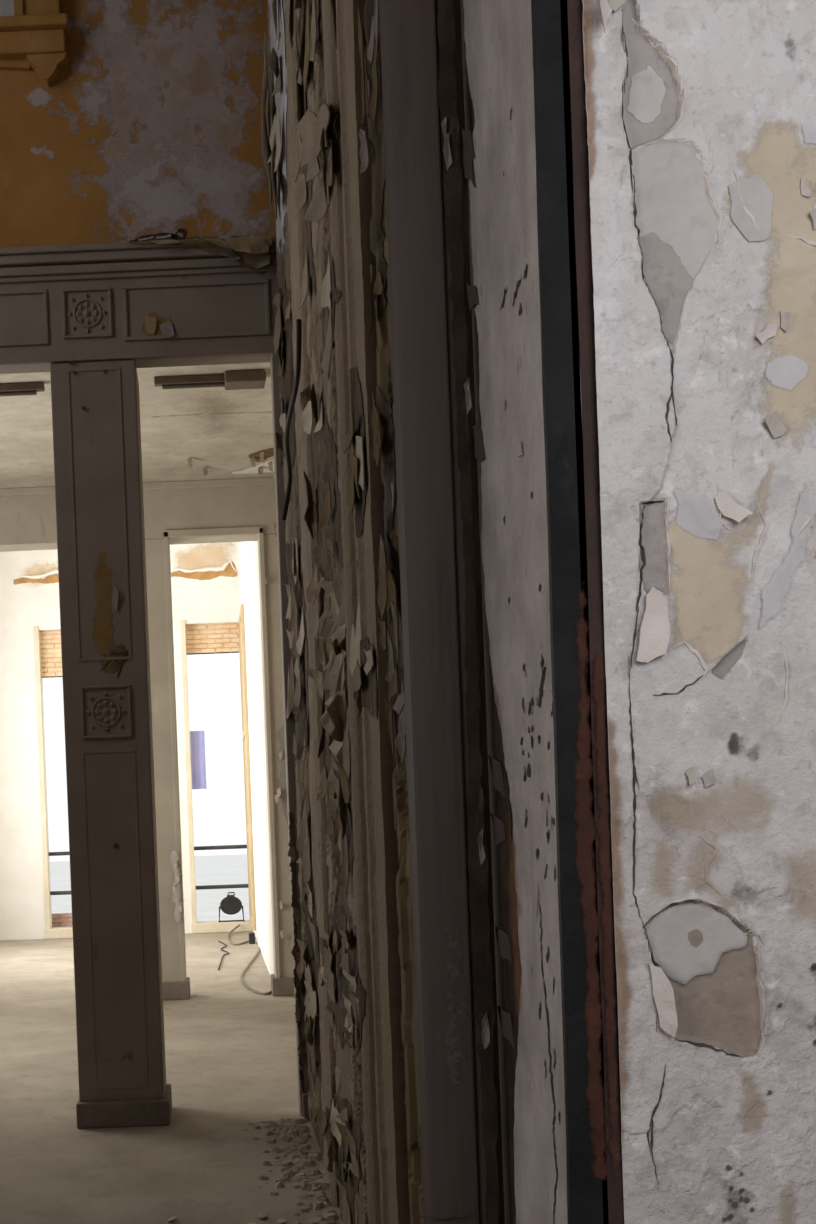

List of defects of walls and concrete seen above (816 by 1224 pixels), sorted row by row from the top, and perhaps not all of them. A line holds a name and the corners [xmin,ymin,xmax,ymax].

crack [600,0,677,441]
peeling [621,0,816,443]
peeling [28,0,407,1093]
peeling [629,466,774,696]
peeling [316,1074,363,1224]
spalling [644,836,766,1058]